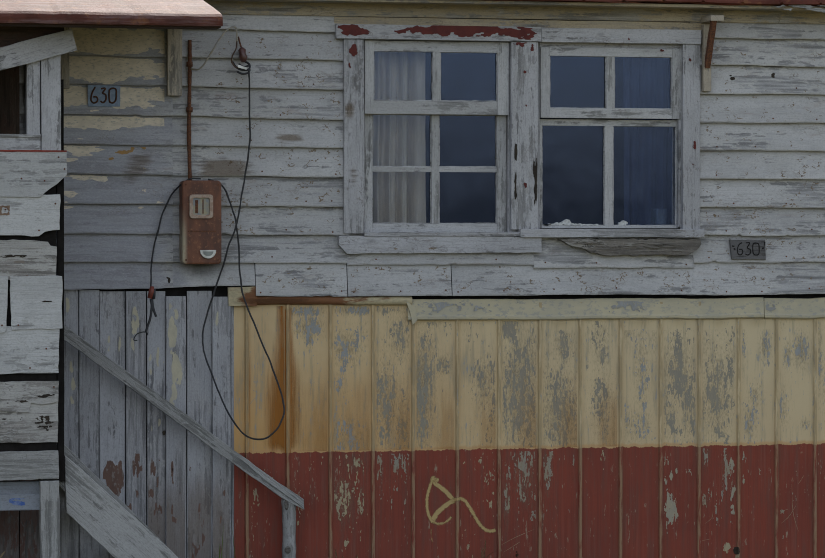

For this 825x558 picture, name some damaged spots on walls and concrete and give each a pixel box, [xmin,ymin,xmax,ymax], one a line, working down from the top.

peeling [394,25,537,51]
rust [255,298,296,453]
peeling [334,302,492,550]
peeling [468,321,576,527]
peeling [590,377,615,439]
peeling [664,326,759,534]